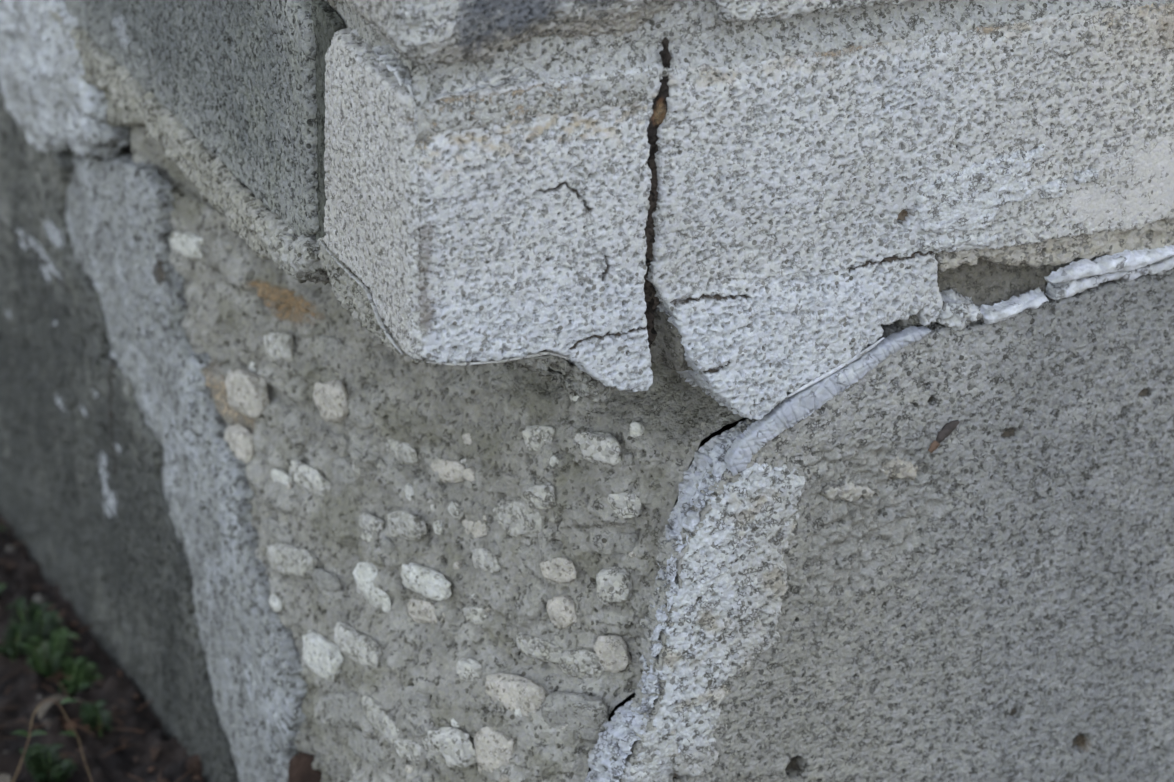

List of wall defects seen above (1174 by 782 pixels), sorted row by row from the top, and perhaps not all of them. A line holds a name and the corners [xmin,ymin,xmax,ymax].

crack [539,182,592,211]
crack [569,37,749,350]
peeling [920,232,1000,252]
crack [848,251,934,272]
peeling [936,245,1174,331]
crack [703,361,730,374]
spalling [104,92,931,782]